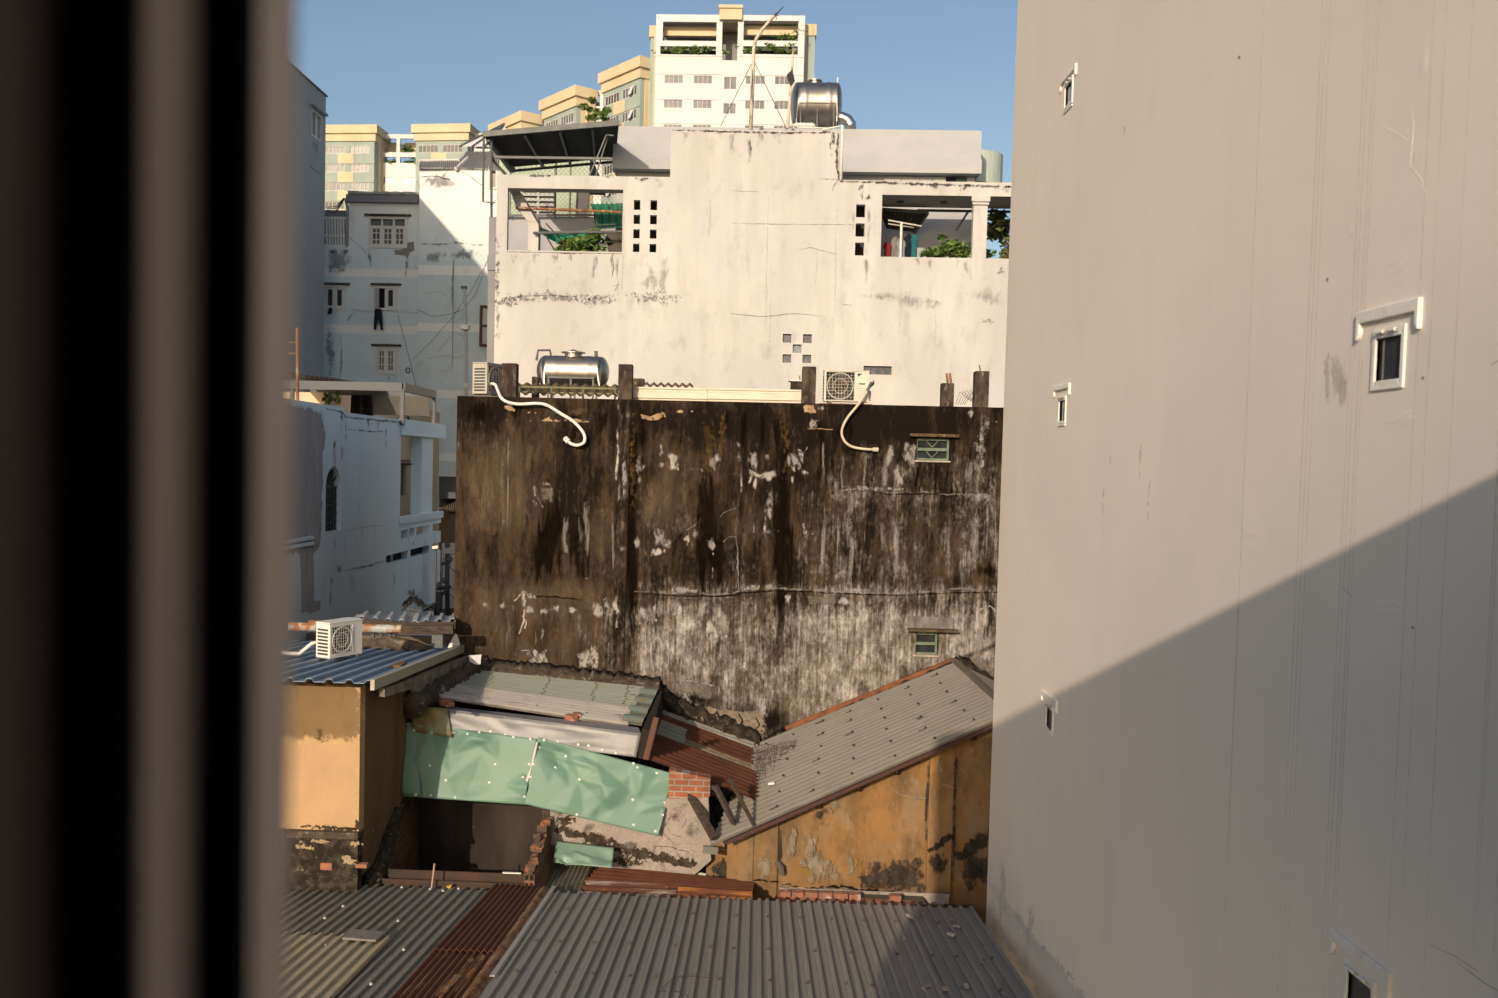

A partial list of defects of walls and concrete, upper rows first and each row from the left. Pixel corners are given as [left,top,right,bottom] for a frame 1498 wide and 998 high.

leakage [484,500,584,662]
leakage [578,648,599,668]
leakage [593,418,725,653]
leakage [725,410,852,629]
leakage [887,443,955,514]
leakage [976,565,997,639]
corrosion [390,883,556,998]
leakage [858,758,1083,998]